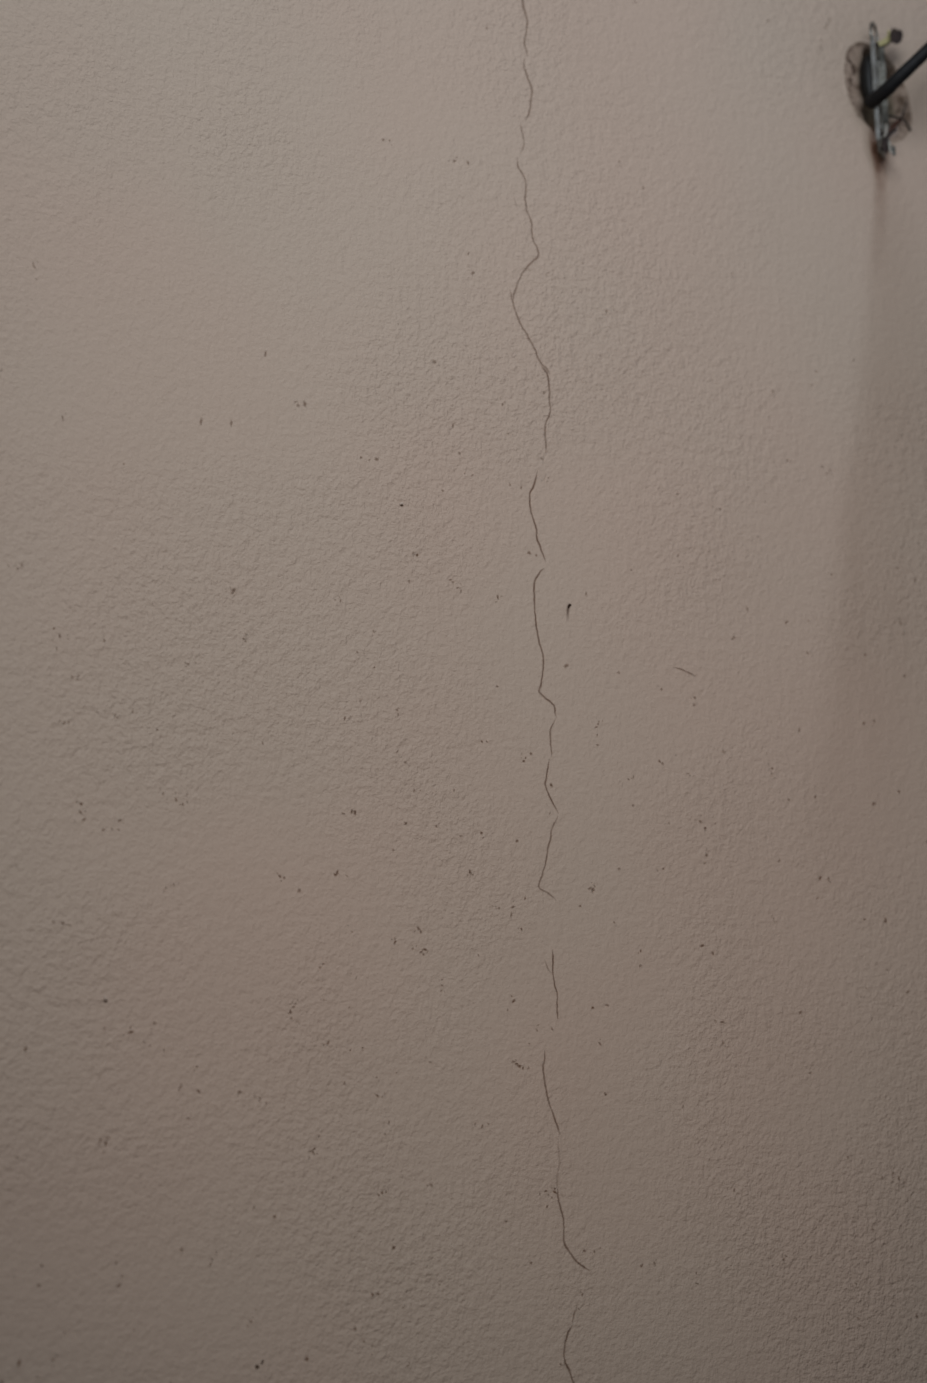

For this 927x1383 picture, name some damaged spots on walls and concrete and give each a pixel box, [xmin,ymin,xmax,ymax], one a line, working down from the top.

crack [529,478,556,805]